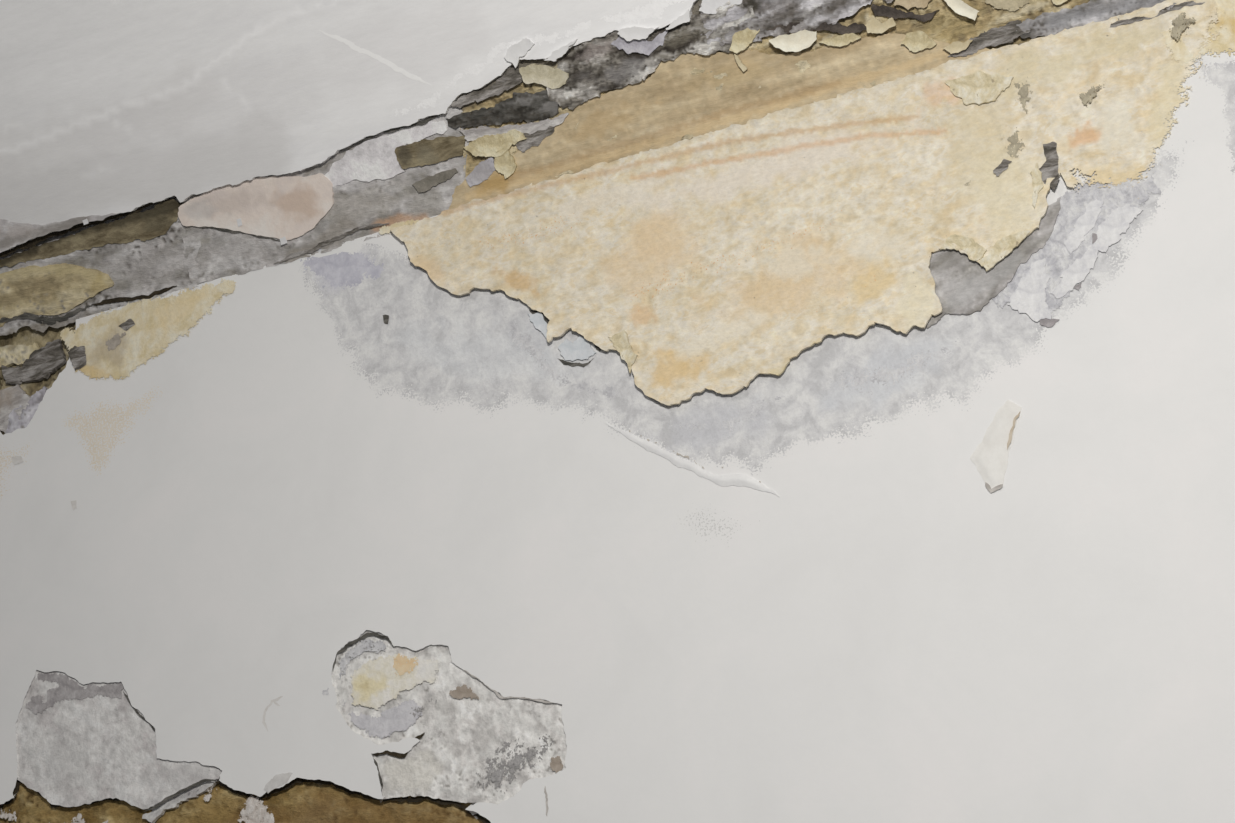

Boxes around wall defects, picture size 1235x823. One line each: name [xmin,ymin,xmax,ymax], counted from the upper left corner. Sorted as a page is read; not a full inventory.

peeling [0,0,1235,435]
leakage [298,140,1194,475]
peeling [970,400,1022,493]
spalling [0,630,567,823]